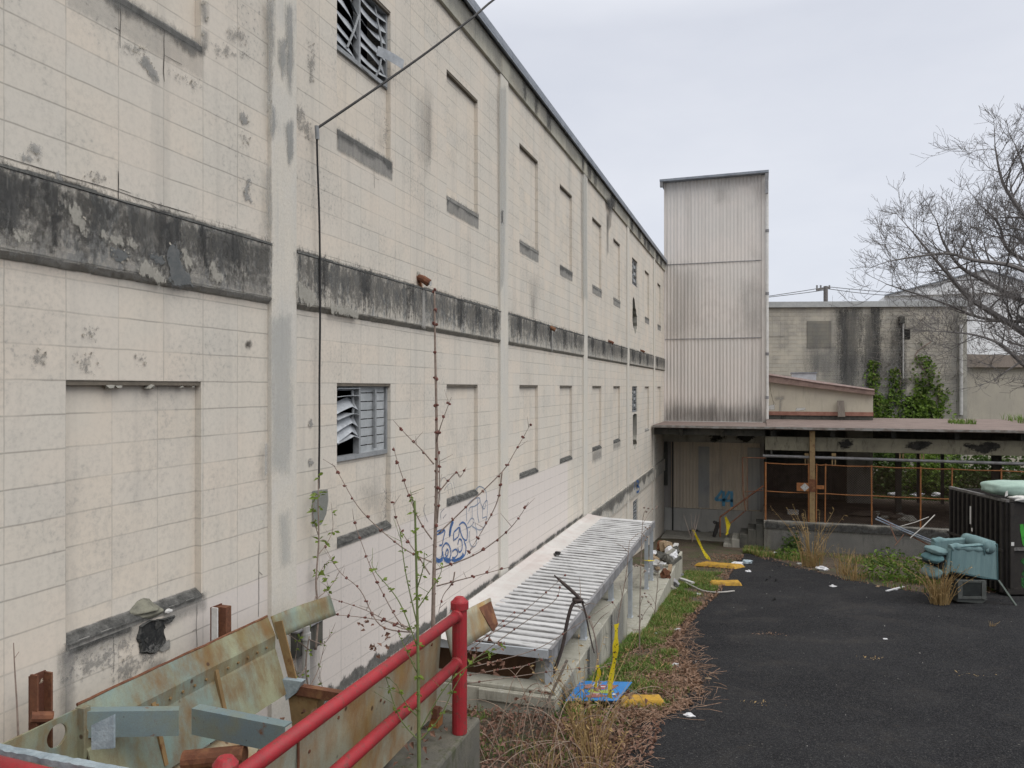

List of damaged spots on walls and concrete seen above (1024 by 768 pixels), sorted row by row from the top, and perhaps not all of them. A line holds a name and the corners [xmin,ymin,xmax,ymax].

peeling [13,229,32,243]
peeling [64,201,90,238]
leakage [0,169,272,285]
peeling [101,229,193,287]
peeling [209,261,223,285]
leakage [297,249,664,368]
leakage [837,308,907,407]
spalling [963,442,1000,454]
spalling [67,608,175,679]